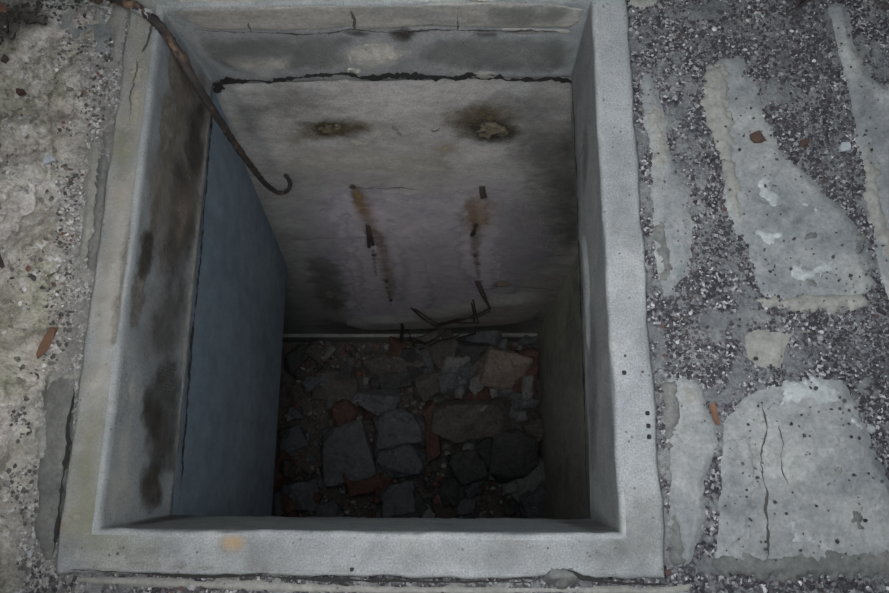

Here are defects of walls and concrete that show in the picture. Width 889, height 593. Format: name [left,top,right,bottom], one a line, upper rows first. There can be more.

crack [200,11,567,36]
crack [178,115,213,511]
crack [213,70,589,506]
damp [314,191,514,318]
crack [52,389,75,554]
damp [141,368,178,507]
crack [760,406,788,562]